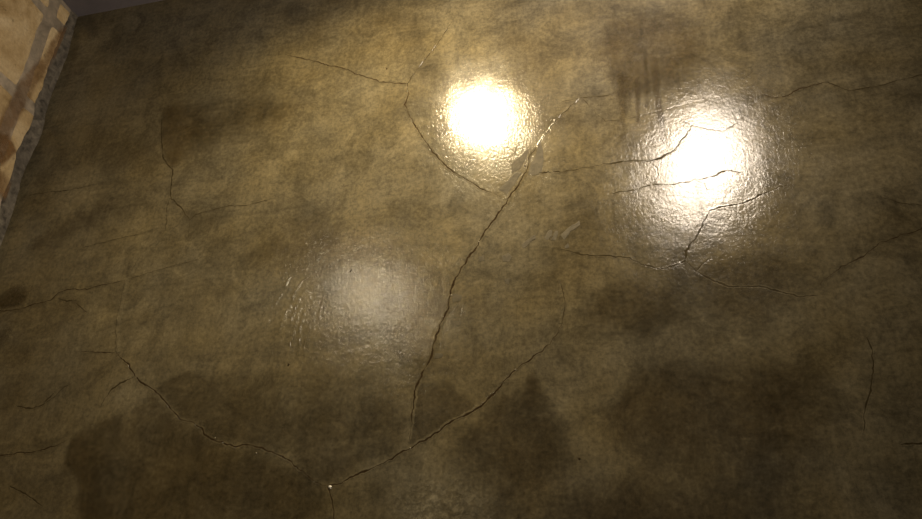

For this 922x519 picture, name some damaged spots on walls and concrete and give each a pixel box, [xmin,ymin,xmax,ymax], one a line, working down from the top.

leakage [609,17,693,143]
crack [0,21,746,519]
crack [552,184,787,272]